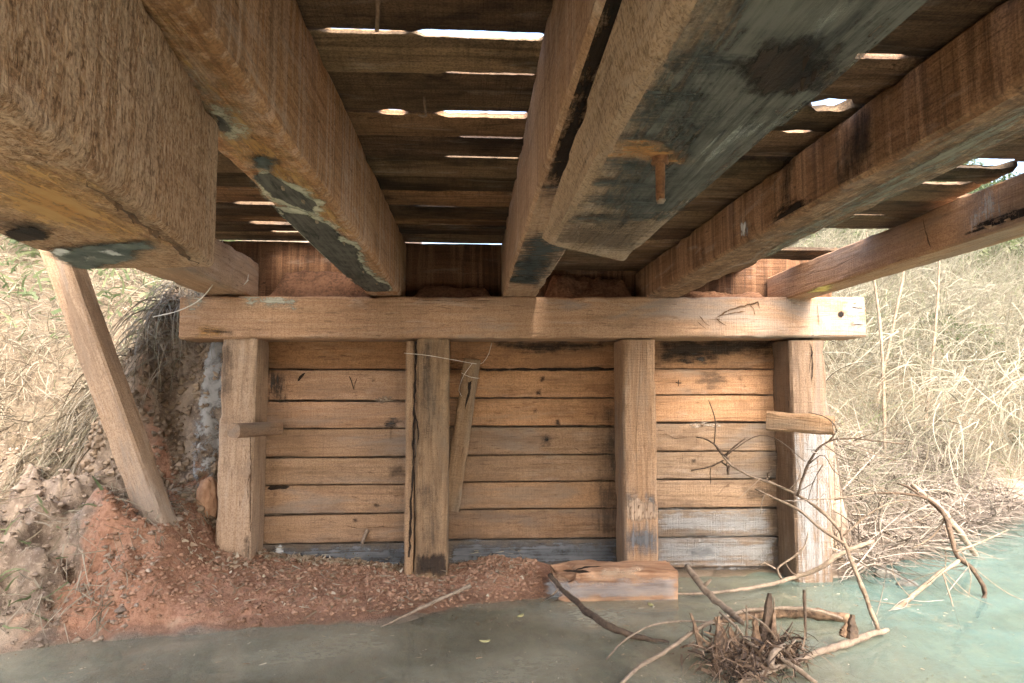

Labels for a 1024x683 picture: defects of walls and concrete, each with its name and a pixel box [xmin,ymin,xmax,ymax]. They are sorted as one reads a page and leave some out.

damp [576,0,928,227]
damp [48,241,154,269]
damp [509,233,566,286]
crack [345,341,419,557]